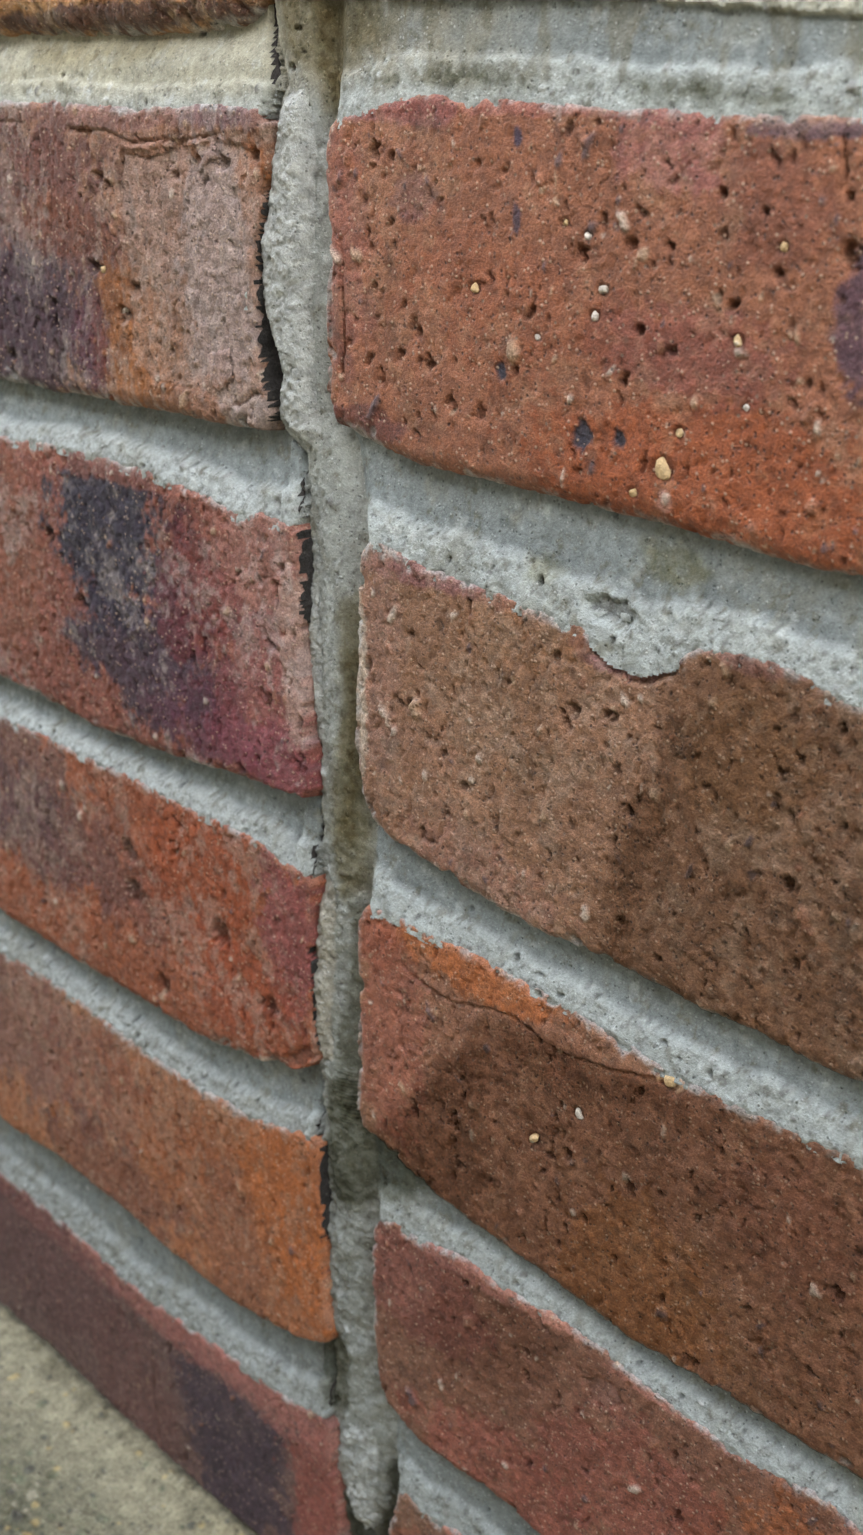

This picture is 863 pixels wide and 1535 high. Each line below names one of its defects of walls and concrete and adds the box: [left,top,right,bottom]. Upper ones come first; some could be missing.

crack [269,3,282,84]
crack [69,128,123,139]
crack [253,191,283,422]
crack [339,286,347,374]
crack [296,465,314,623]
spalling [587,596,638,628]
spalling [612,666,678,684]
crack [311,814,325,878]
crack [307,946,320,1046]
crack [315,1112,333,1240]
crack [329,1380,337,1407]